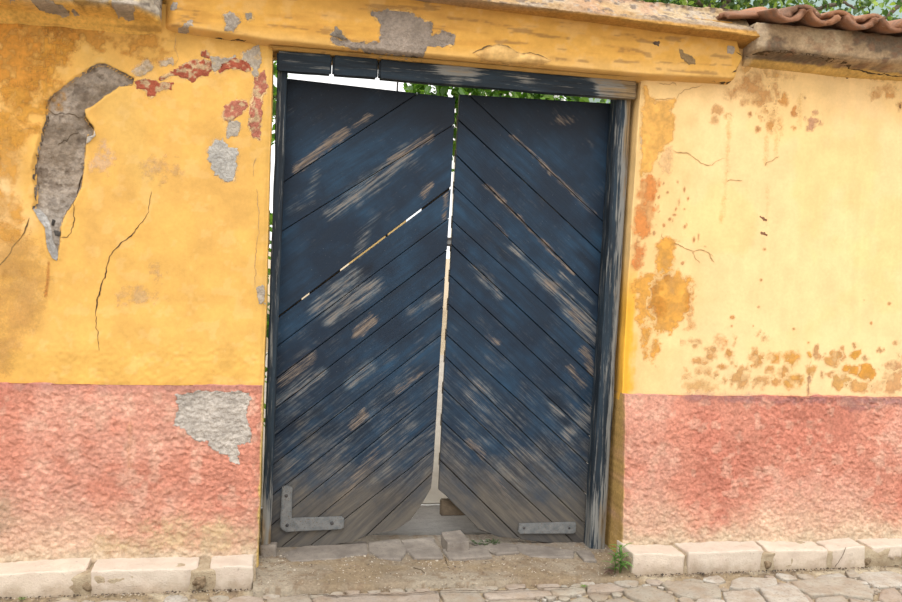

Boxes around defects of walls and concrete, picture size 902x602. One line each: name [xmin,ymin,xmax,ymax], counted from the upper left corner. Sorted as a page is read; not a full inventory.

peeling [330,8,456,60]
spalling [32,45,269,261]
crack [0,219,29,265]
crack [95,196,151,347]
crack [661,234,714,262]